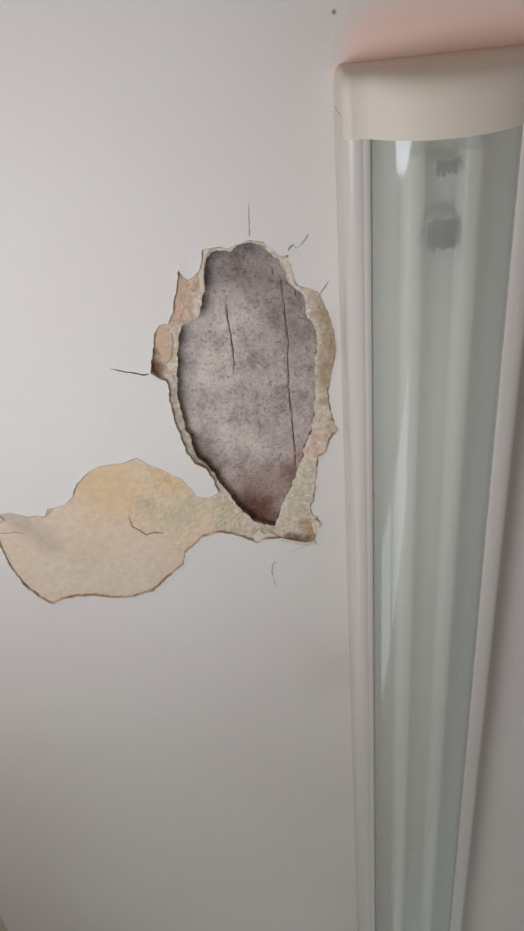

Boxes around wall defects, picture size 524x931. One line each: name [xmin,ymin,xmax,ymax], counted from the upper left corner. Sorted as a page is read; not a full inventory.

flaking render [0,240,338,604]